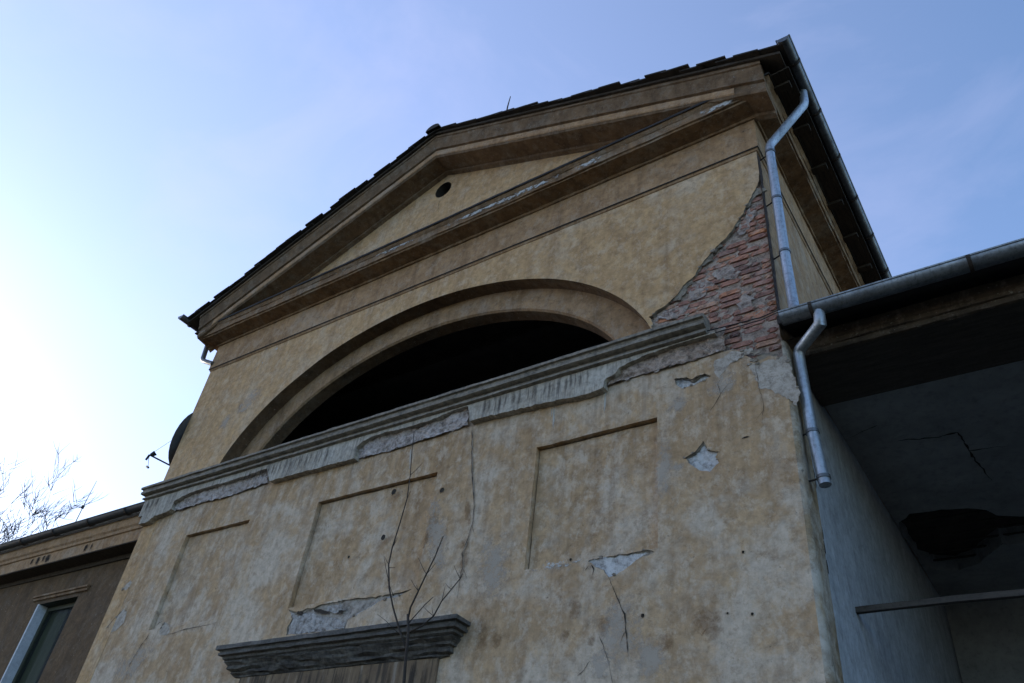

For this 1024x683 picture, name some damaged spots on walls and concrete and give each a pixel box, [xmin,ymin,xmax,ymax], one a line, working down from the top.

flaking render [607,183,800,405]
flaking render [683,443,719,472]
crack [899,432,1005,480]
flaking render [532,549,654,577]
flaking render [287,591,408,635]
crack [580,565,628,679]